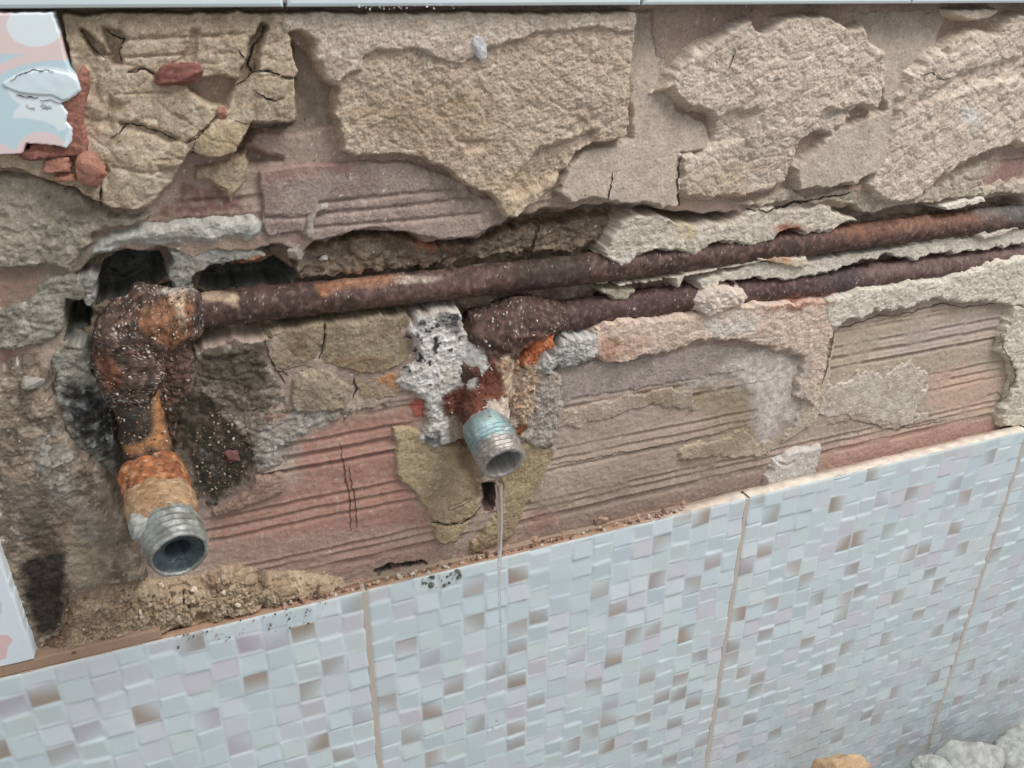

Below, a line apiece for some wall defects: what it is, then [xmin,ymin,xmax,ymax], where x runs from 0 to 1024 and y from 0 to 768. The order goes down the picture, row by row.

crack [80,30,155,75]
crack [237,26,296,101]
spalling [27,65,91,158]
crack [110,117,252,154]
peeling [918,195,985,210]
spalling [64,249,167,342]
spalling [197,255,297,291]
corrosion [518,333,555,370]
corrosion [160,341,194,444]
corrosion [442,362,508,425]
leakage [171,393,333,499]
leakage [23,554,64,632]